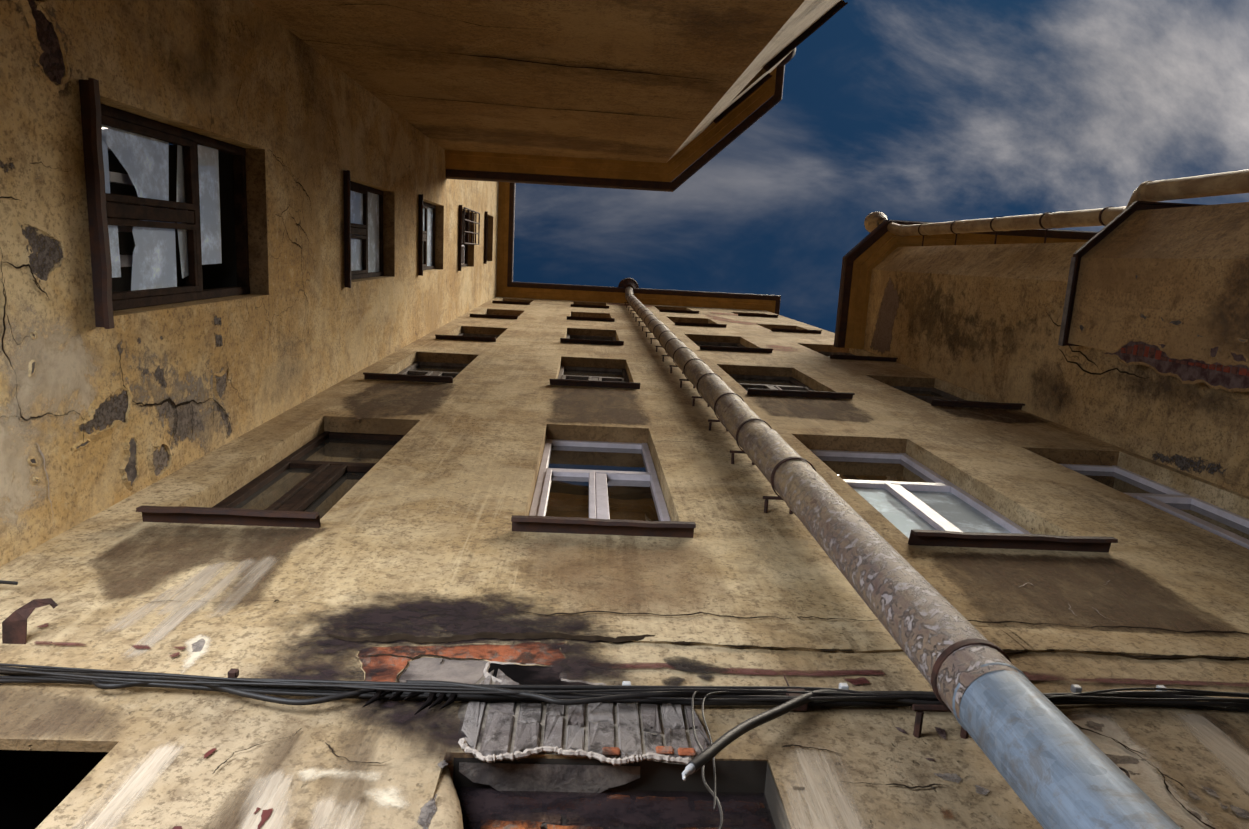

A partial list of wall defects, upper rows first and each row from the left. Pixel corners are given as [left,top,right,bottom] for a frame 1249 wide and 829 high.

peeling [7,0,72,94]
spalling [15,216,67,289]
crack [0,248,97,528]
spalling [72,336,232,490]
spalling [214,315,223,347]
crack [1046,312,1149,379]
flaking render [1103,333,1249,392]
flaking render [354,641,606,685]
spalling [1105,754,1146,775]
crack [1072,722,1216,829]